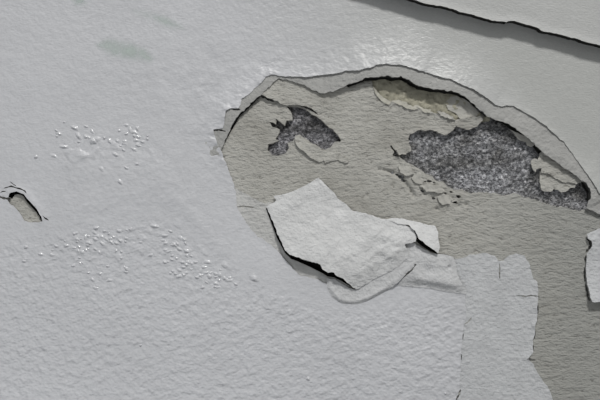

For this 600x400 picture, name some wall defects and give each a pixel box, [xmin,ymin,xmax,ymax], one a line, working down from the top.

peeling [0,182,48,222]
peeling [205,64,600,400]